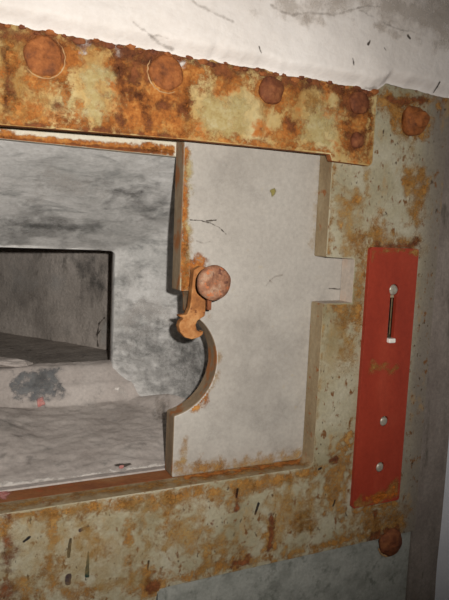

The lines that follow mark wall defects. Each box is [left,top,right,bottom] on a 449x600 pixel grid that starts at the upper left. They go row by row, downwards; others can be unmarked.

rust [0,29,447,358]
rust [0,430,405,600]